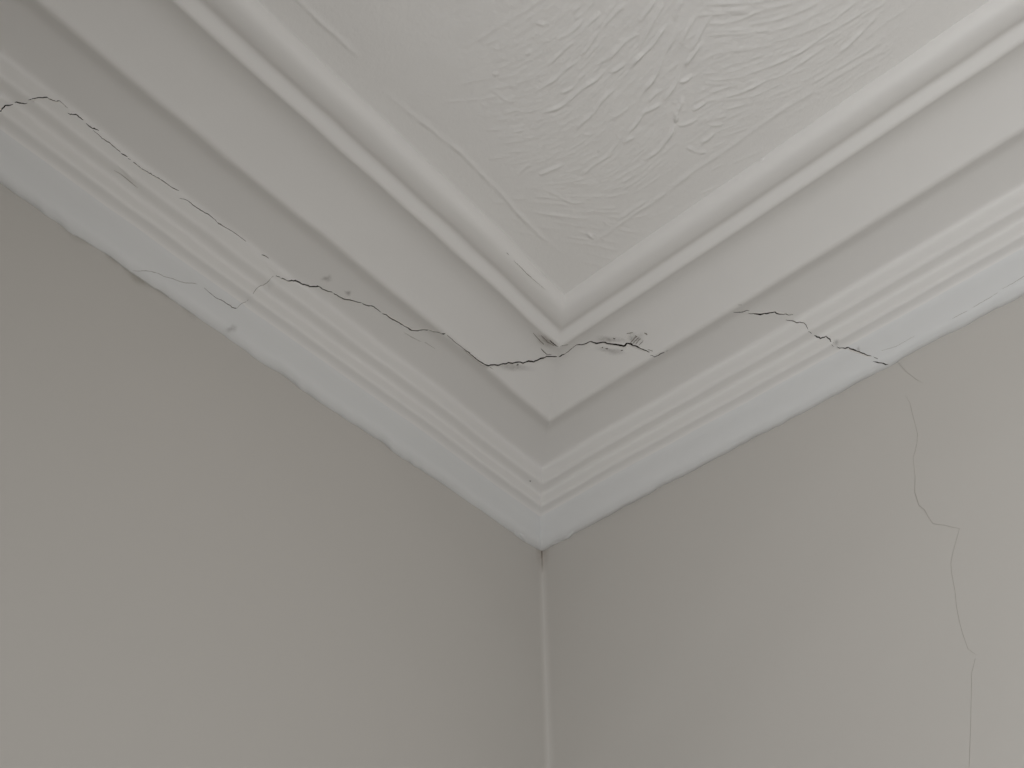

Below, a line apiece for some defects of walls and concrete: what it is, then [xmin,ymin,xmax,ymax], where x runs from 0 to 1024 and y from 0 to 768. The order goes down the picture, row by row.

crack [0,97,244,240]
crack [142,255,664,368]
crack [735,310,974,690]